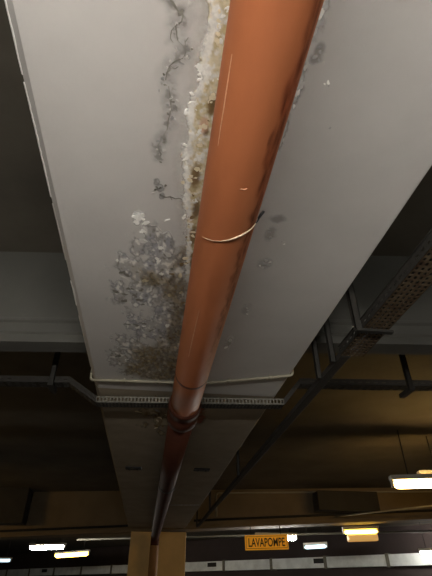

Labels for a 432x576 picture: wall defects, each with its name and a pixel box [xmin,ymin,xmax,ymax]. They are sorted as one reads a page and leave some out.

peeling [105,211,190,380]
damp [146,0,230,297]